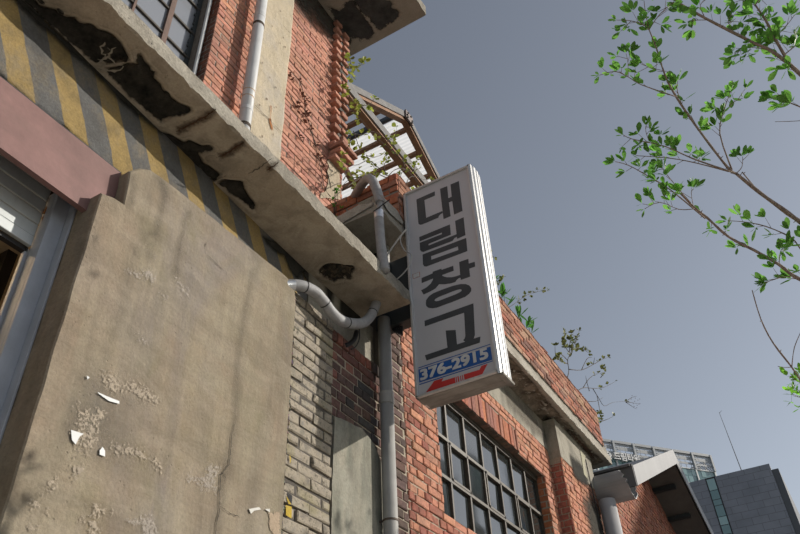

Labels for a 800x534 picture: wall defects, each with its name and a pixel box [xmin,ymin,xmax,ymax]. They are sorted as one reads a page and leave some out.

spalling [329,0,399,45]
spalling [25,0,190,121]
spalling [162,132,255,209]
spalling [319,264,355,282]
peeling [99,364,162,407]
peeling [25,401,114,534]
peeling [109,438,166,475]
crack [215,430,240,534]
peeling [268,475,292,534]